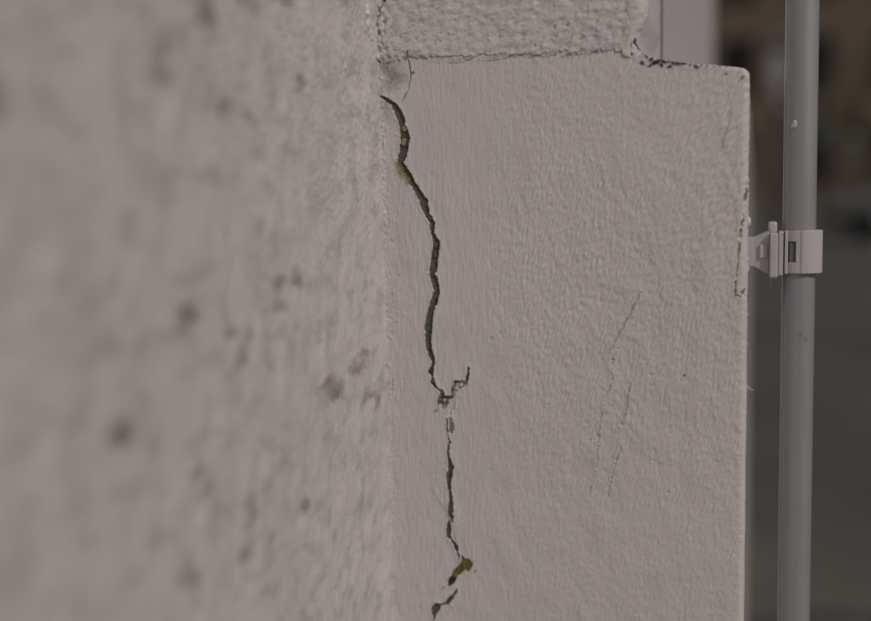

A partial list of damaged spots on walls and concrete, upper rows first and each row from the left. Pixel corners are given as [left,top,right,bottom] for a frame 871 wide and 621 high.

crack [380,37,641,402]
crack [428,422,461,557]
crack [432,589,457,619]